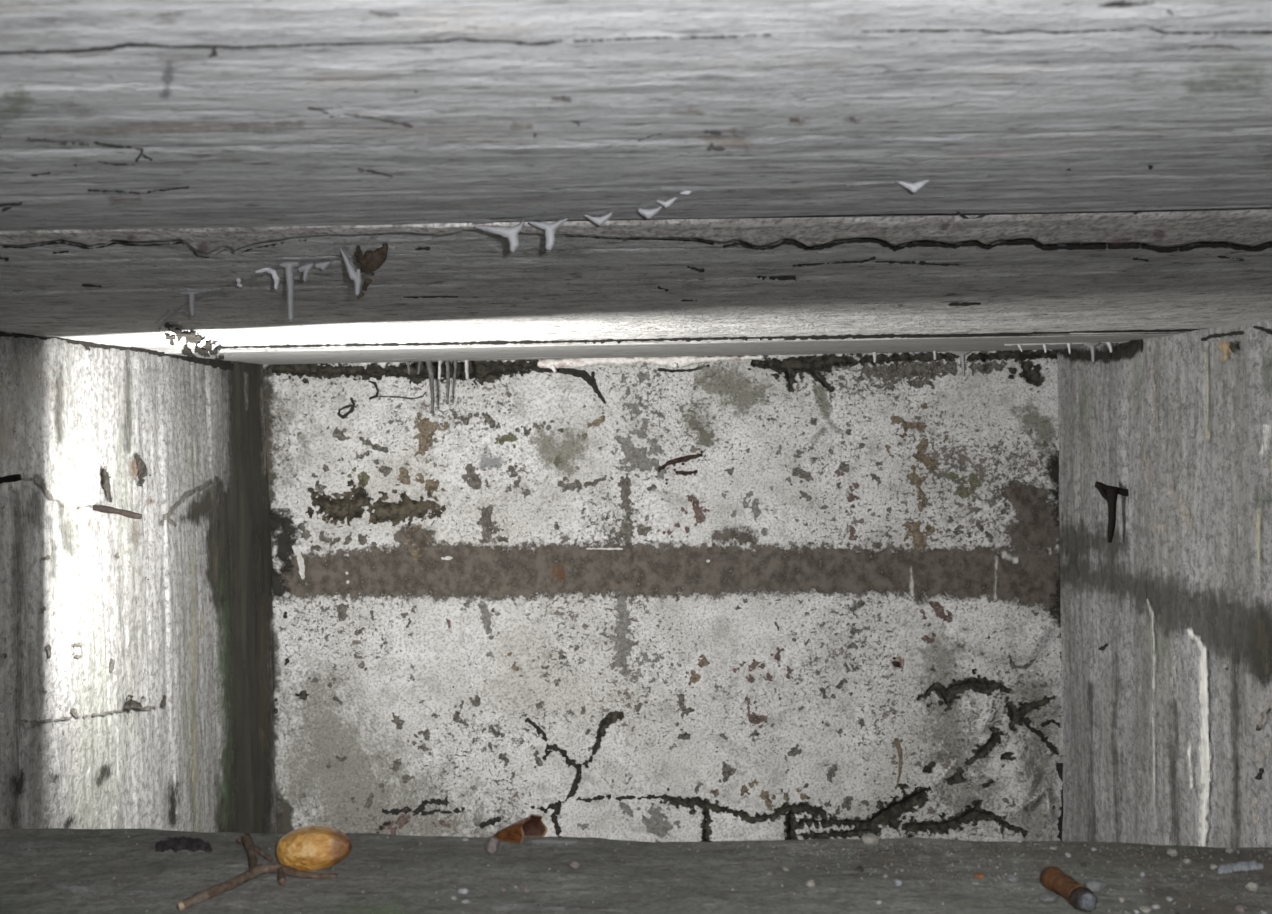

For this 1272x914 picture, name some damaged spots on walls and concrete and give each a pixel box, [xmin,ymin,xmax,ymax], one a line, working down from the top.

crack [846,174,987,187]
crack [472,186,1272,301]
crack [0,239,1272,404]
damp [168,361,1272,847]
crack [894,738,903,790]
crack [1020,716,1063,841]